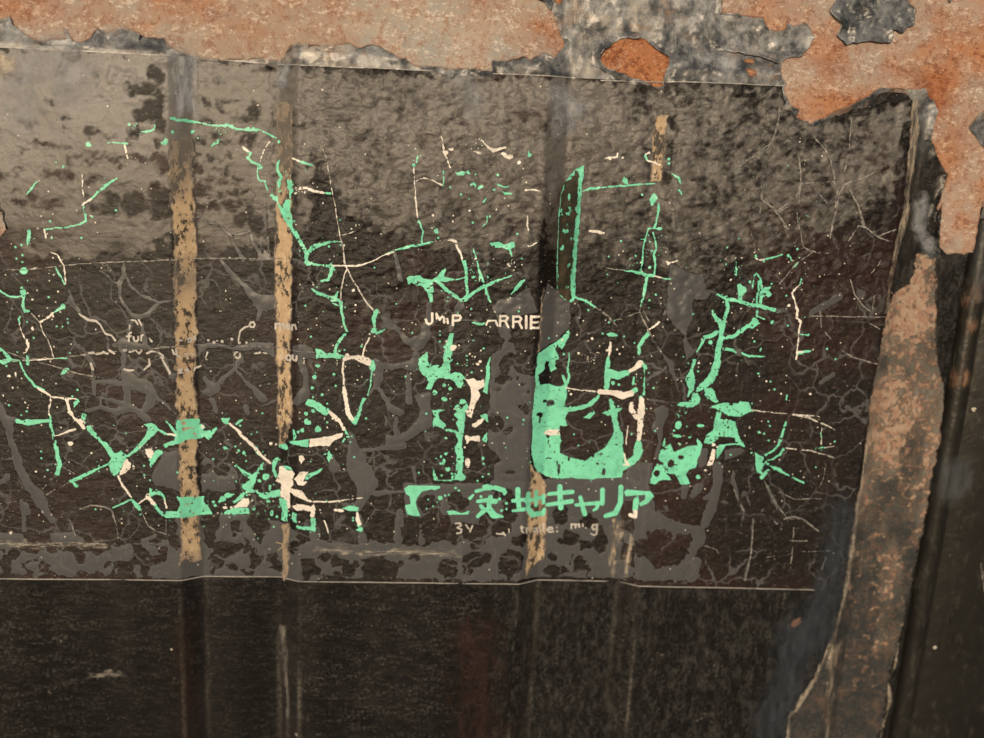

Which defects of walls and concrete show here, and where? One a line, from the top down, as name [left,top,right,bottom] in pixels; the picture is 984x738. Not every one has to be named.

corrosion [0,0,570,77]
corrosion [590,31,677,88]
peeling [674,14,815,64]
peeling [830,0,916,45]
corrosion [0,203,8,236]
crack [8,258,303,270]
crack [322,146,375,312]
peeling [556,165,584,302]
crack [748,108,897,365]
crack [3,313,315,377]
corrosion [715,0,984,738]
crack [733,410,835,580]